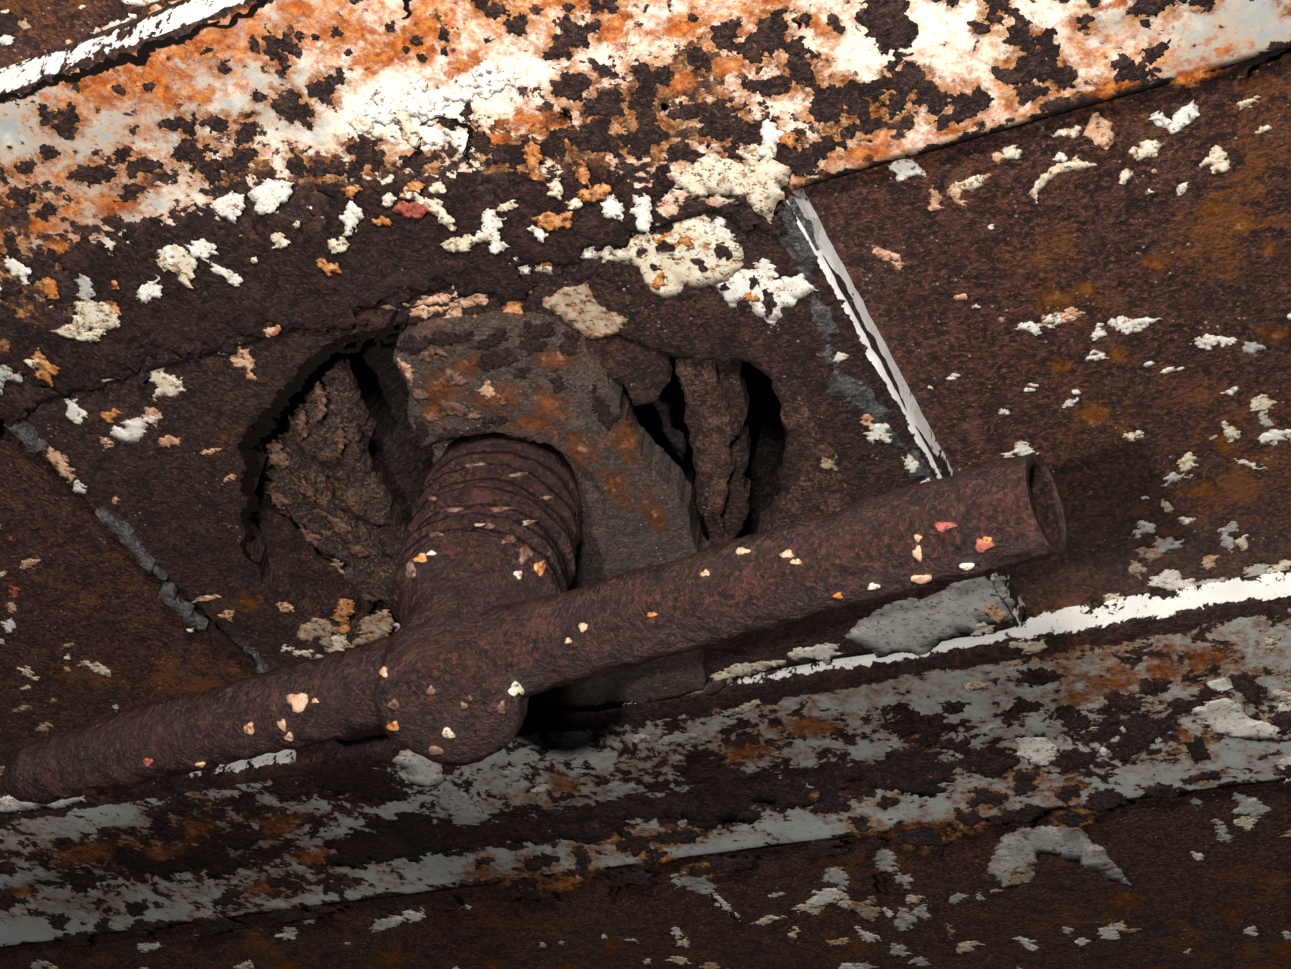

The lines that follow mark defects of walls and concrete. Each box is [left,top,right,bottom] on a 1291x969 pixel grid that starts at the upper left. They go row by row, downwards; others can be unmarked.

corrosion [0,0,1233,351]
peeling [1029,112,1115,204]
peeling [1119,99,1200,196]
spalling [0,59,821,449]
peeling [999,307,1163,362]
crack [237,311,409,565]
corrosion [395,319,666,530]
peeling [683,574,1015,697]
corrosion [462,824,725,892]
spalling [58,639,1291,940]
corrosion [804,768,1095,850]
corrosion [1174,727,1229,786]